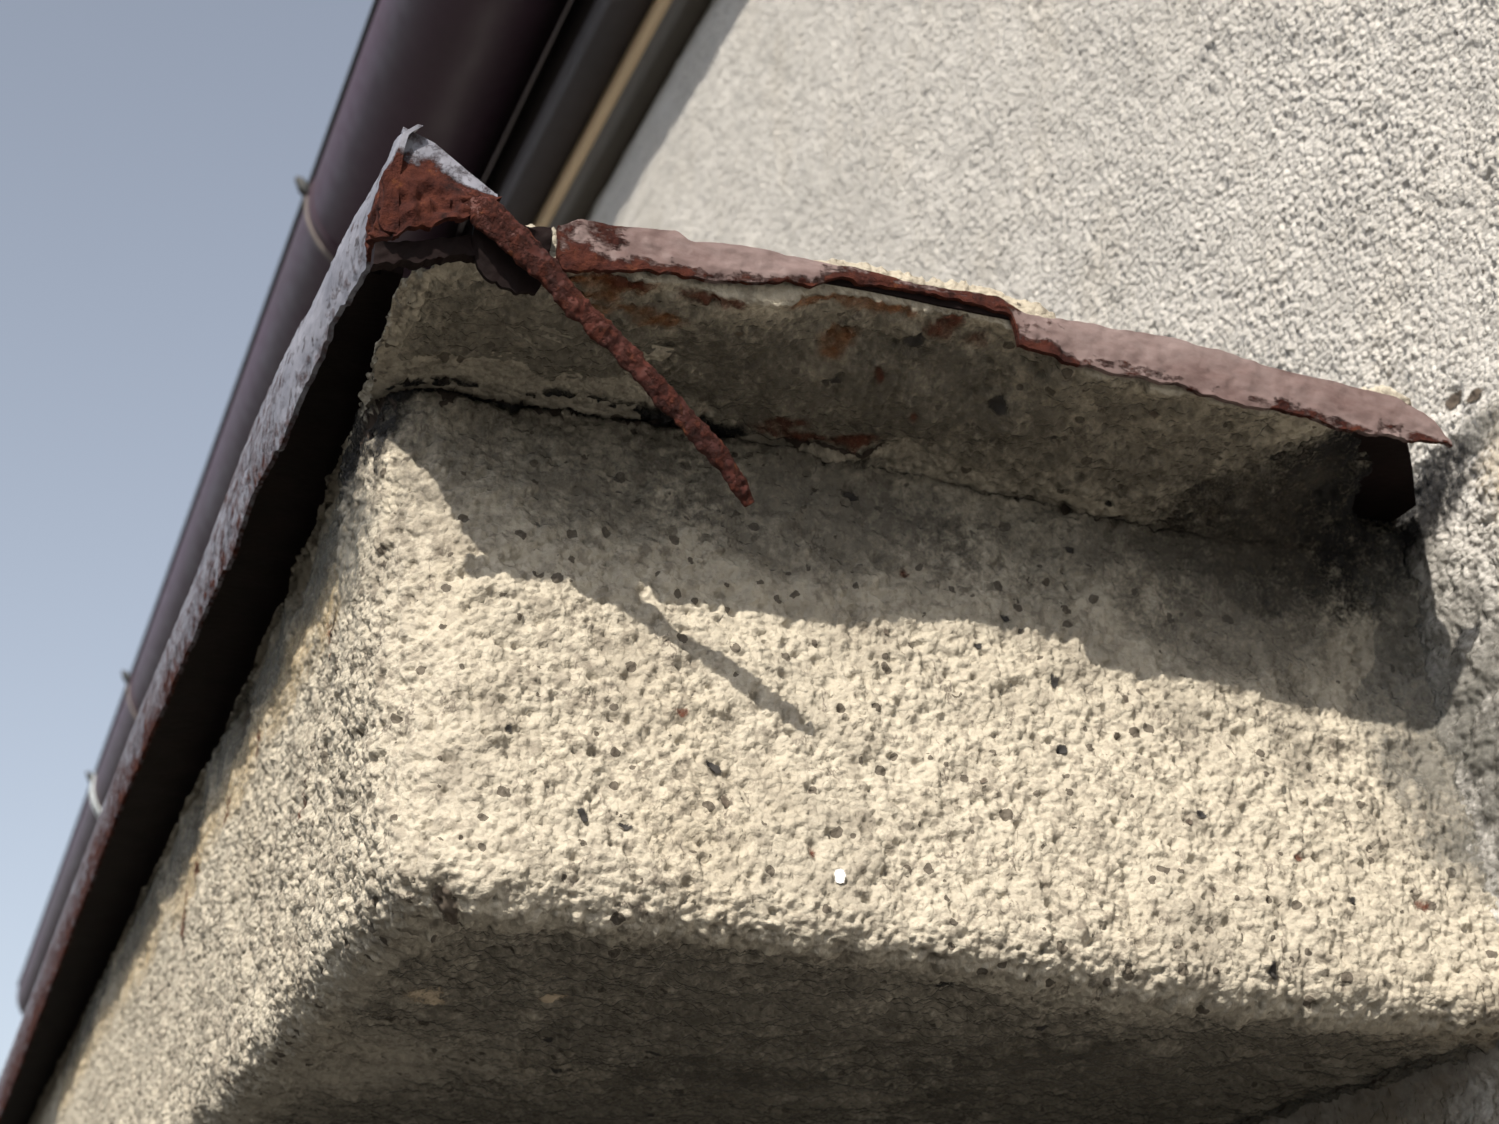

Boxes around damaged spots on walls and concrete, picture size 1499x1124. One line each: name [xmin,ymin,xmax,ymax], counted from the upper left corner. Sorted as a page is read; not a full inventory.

rust [568,272,680,325]
rust [679,288,747,310]
rust [926,314,986,346]
crack [358,376,889,459]
rust [758,417,877,452]
leakage [984,411,1499,885]